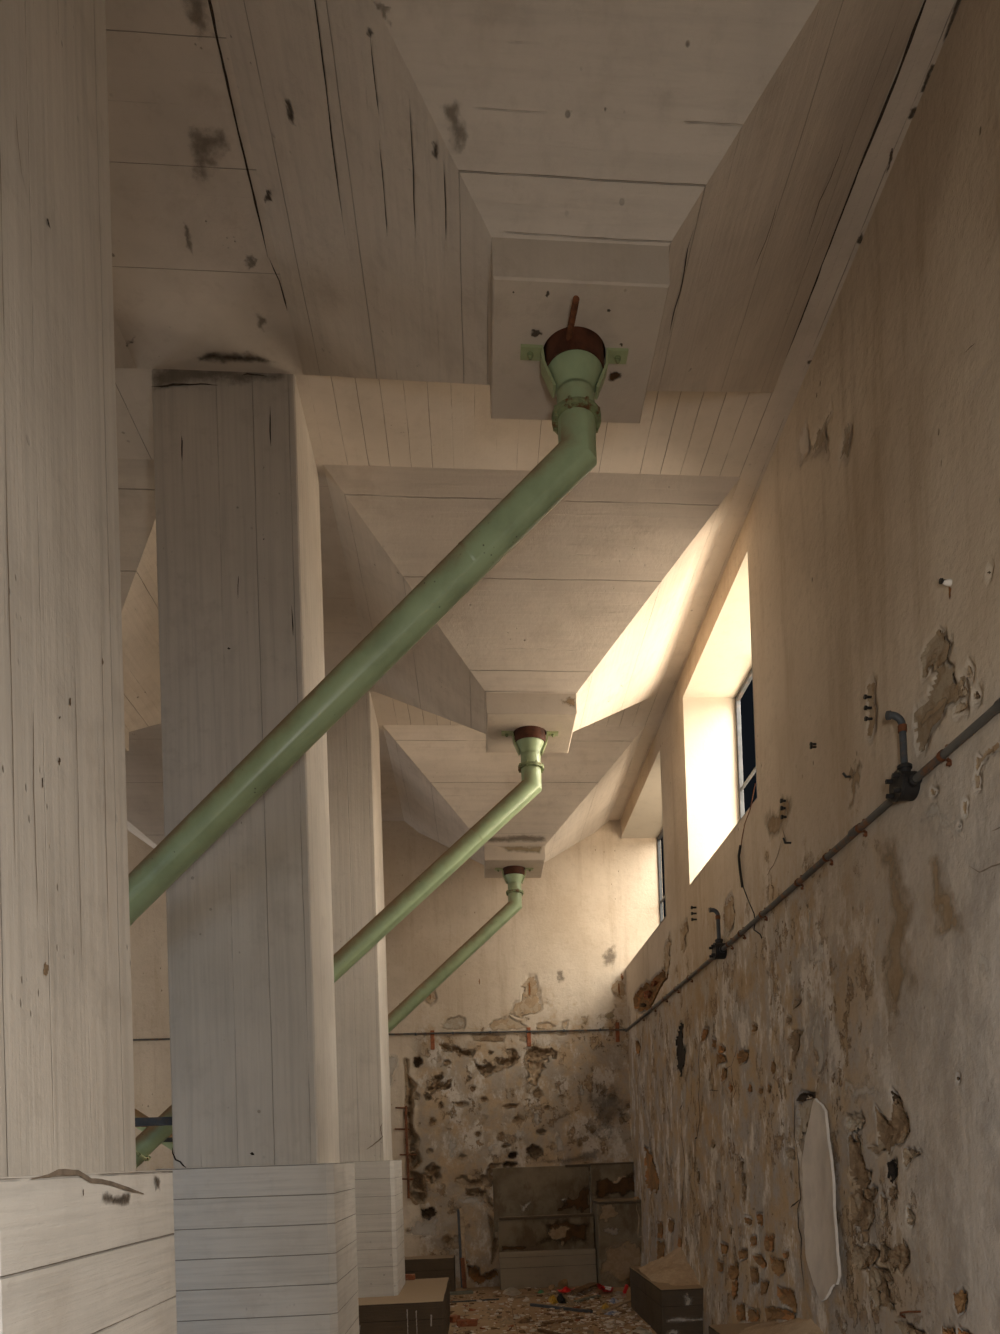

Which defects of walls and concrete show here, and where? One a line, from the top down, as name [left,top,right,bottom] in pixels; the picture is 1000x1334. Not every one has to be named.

crack [786,0,926,357]
peeling [914,629,981,753]
spalling [633,969,668,1012]
flaking render [701,999,802,1094]
crack [31,1169,144,1194]
peeling [395,995,567,1264]
flaking render [644,1147,659,1194]
flaking render [657,1219,682,1259]
flaking render [716,1213,797,1322]
peeling [785,1091,926,1334]
flaking render [942,1290,969,1334]